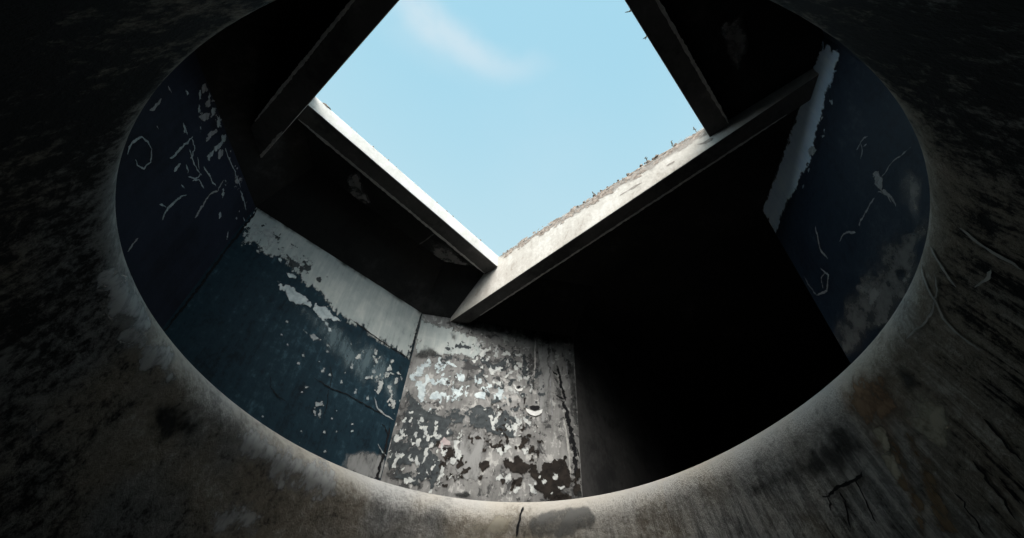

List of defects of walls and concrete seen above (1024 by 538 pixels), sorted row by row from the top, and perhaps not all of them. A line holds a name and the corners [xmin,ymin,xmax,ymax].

peeling [186,83,243,198]
peeling [480,41,839,316]
peeling [236,202,581,501]
crack [534,338,580,481]
crack [516,507,524,537]
leakage [530,491,595,538]
crack [822,472,877,527]